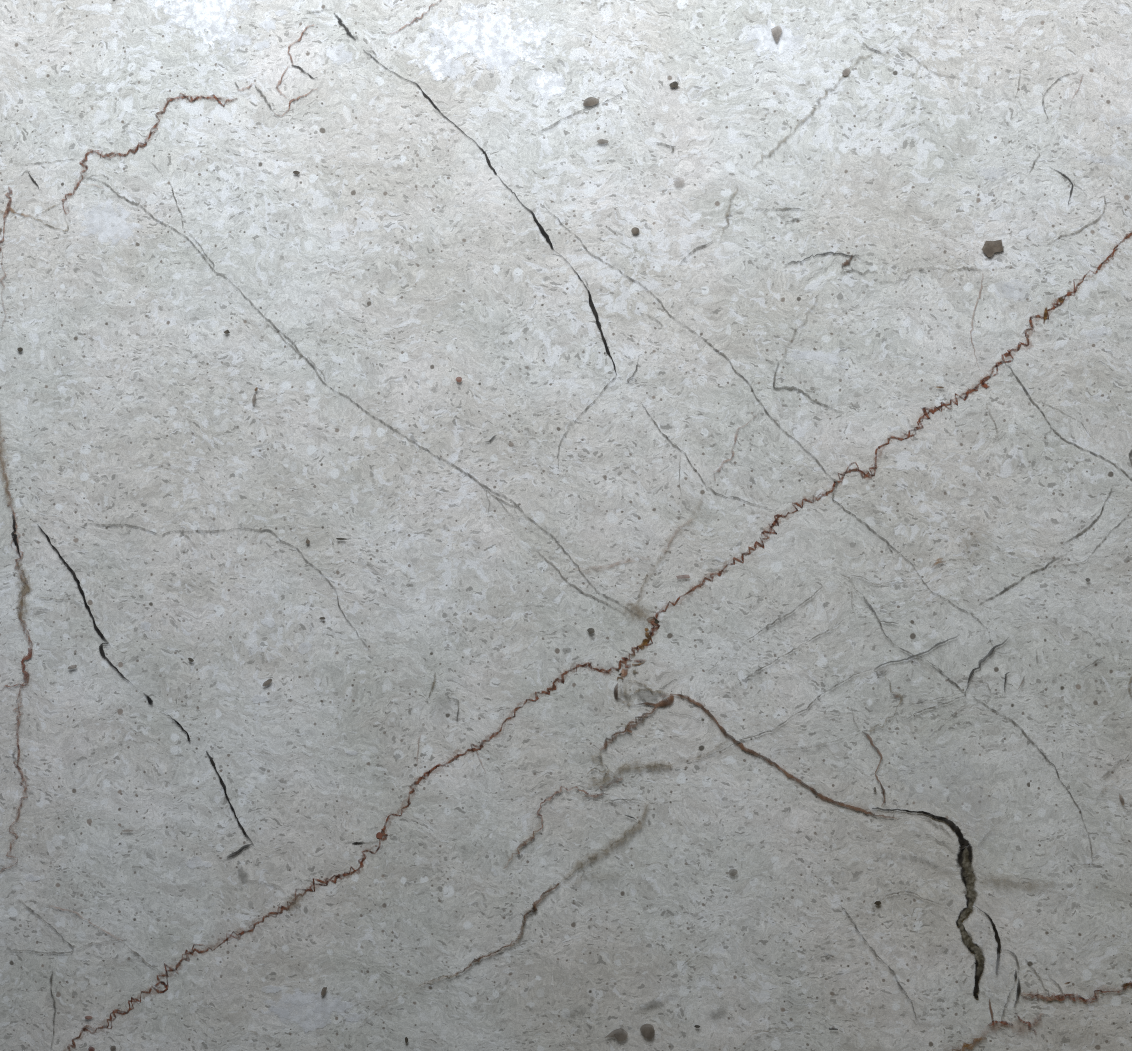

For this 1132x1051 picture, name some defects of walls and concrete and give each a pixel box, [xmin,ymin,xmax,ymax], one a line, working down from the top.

crack [0,9,628,611]
crack [1030,154,1073,199]
crack [1054,199,1106,241]
crack [0,450,254,869]
crack [68,220,1132,1051]